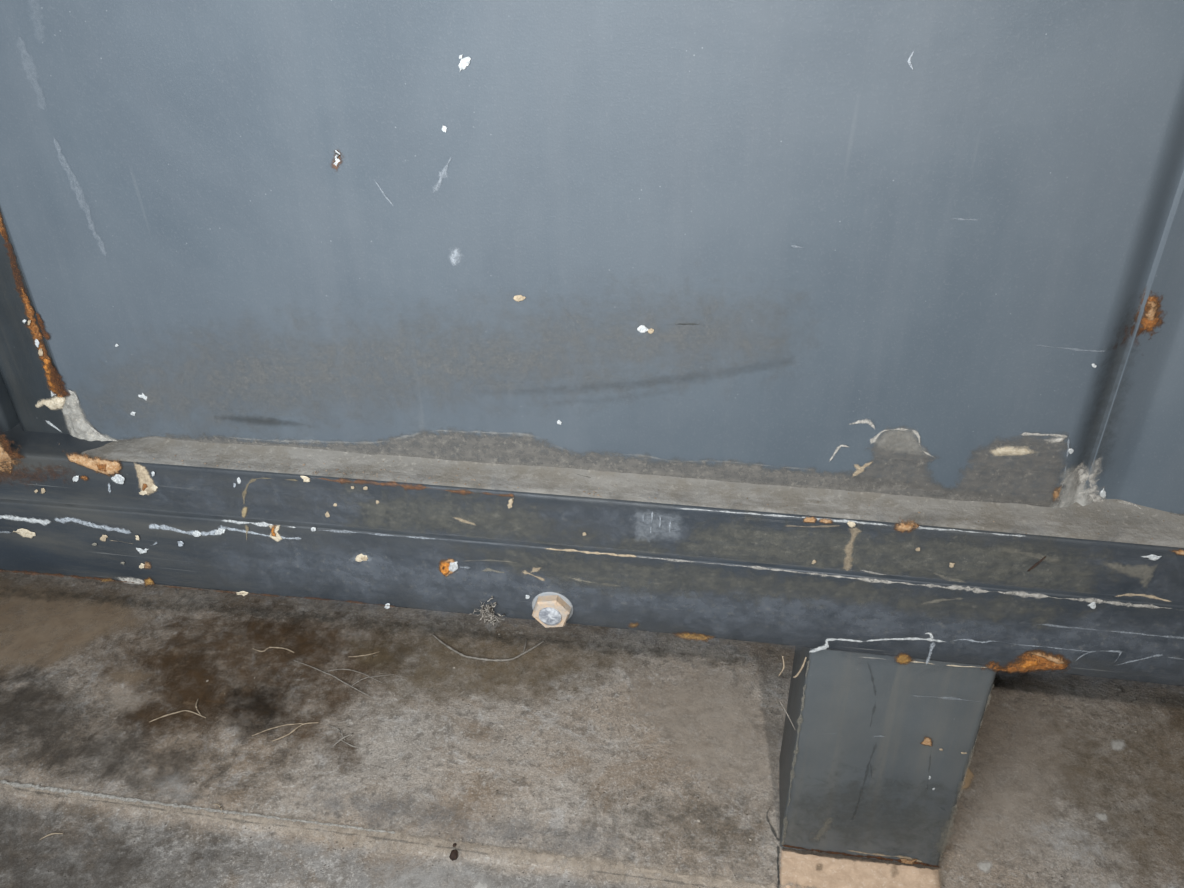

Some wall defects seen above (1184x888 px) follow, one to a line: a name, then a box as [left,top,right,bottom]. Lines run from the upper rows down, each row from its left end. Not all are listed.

corrosion [1124,291,1163,341]
peeling [36,390,117,441]
peeling [135,464,158,495]
peeling [5,528,36,538]
peeling [92,535,157,569]
peeling [178,528,225,547]
peeling [269,525,282,542]
peeling [439,558,468,577]
peeling [1109,555,1171,602]
corrosion [981,650,1070,673]
leakage [0,580,580,782]